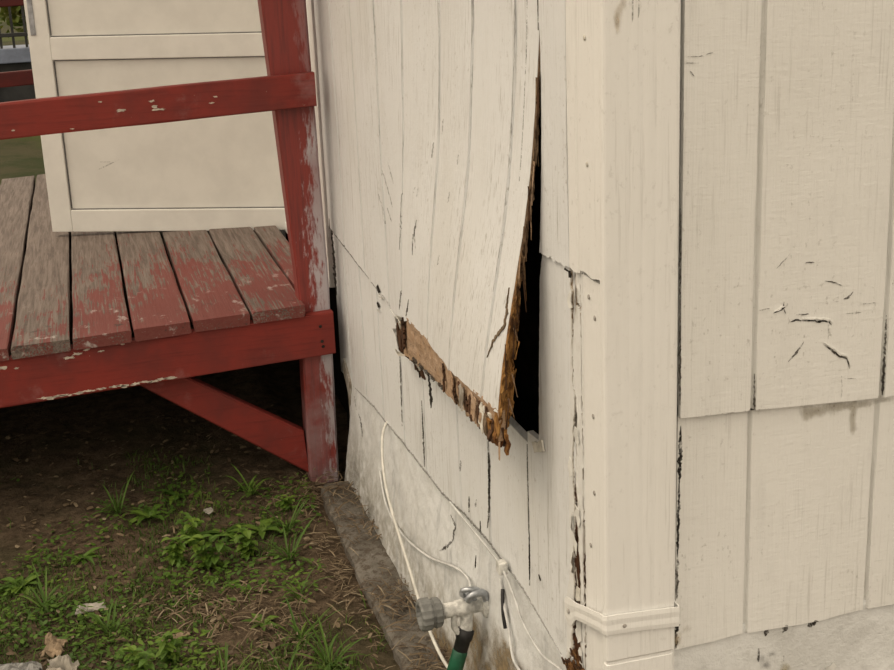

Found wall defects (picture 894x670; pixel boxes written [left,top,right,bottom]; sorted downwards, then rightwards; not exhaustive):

spalling [376,284,506,442]
crack [767,301,851,379]
leakage [433,627,453,660]
leakage [466,620,517,670]
peeling [575,620,583,668]